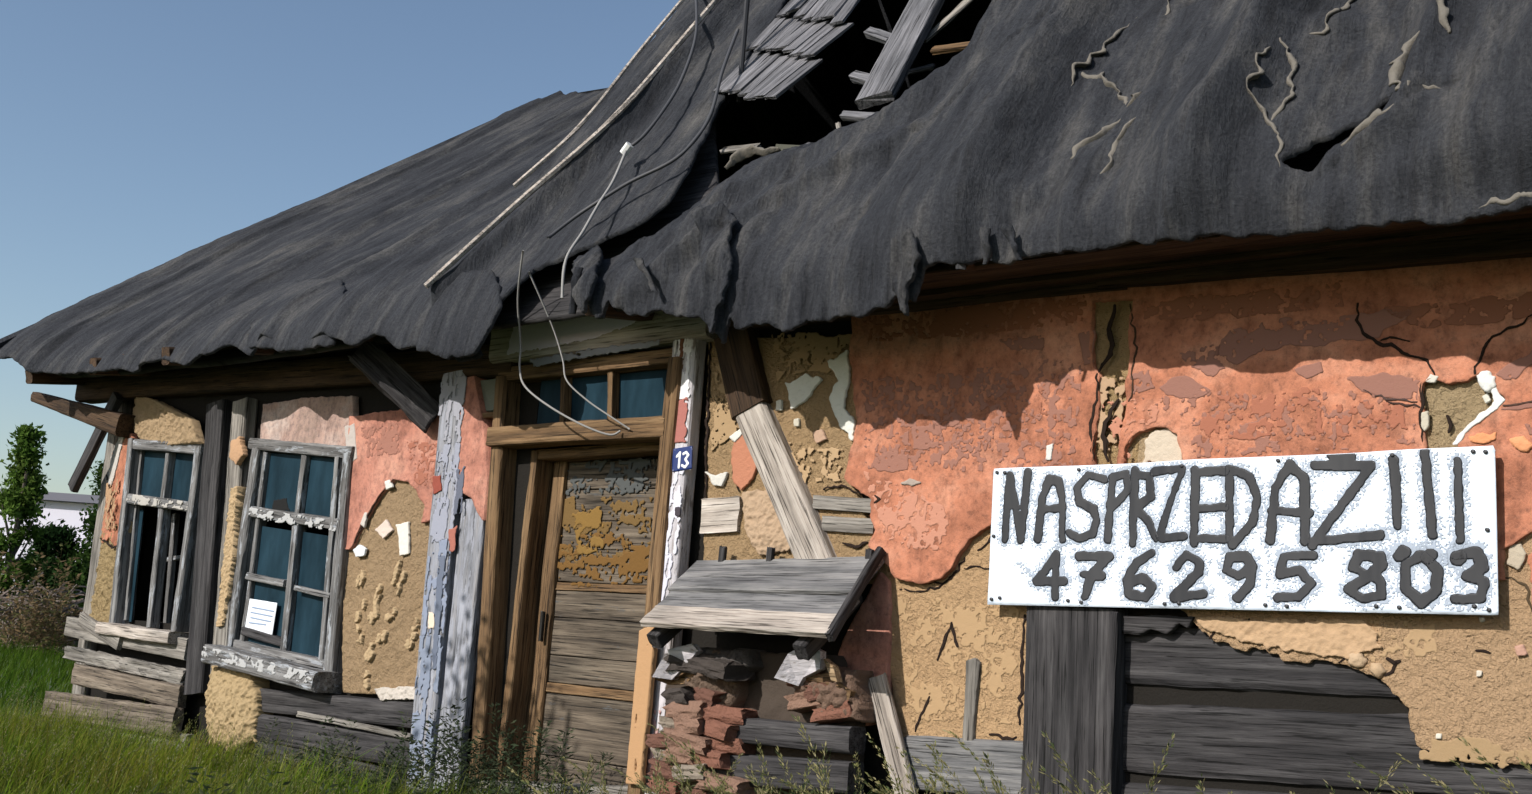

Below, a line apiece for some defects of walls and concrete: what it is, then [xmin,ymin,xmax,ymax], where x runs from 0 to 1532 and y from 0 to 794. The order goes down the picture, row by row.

flaking render [674,338,794,560]
flaking render [757,338,873,557]
crack [1089,304,1138,462]
crack [1355,303,1453,442]
flaking render [1421,371,1532,452]
crack [1473,314,1532,375]
crack [1502,400,1532,408]
flaking render [216,486,338,627]
flaking render [342,375,467,779]
peeling [626,627,661,785]
flaking render [868,528,1036,741]
flaking render [1181,533,1532,764]